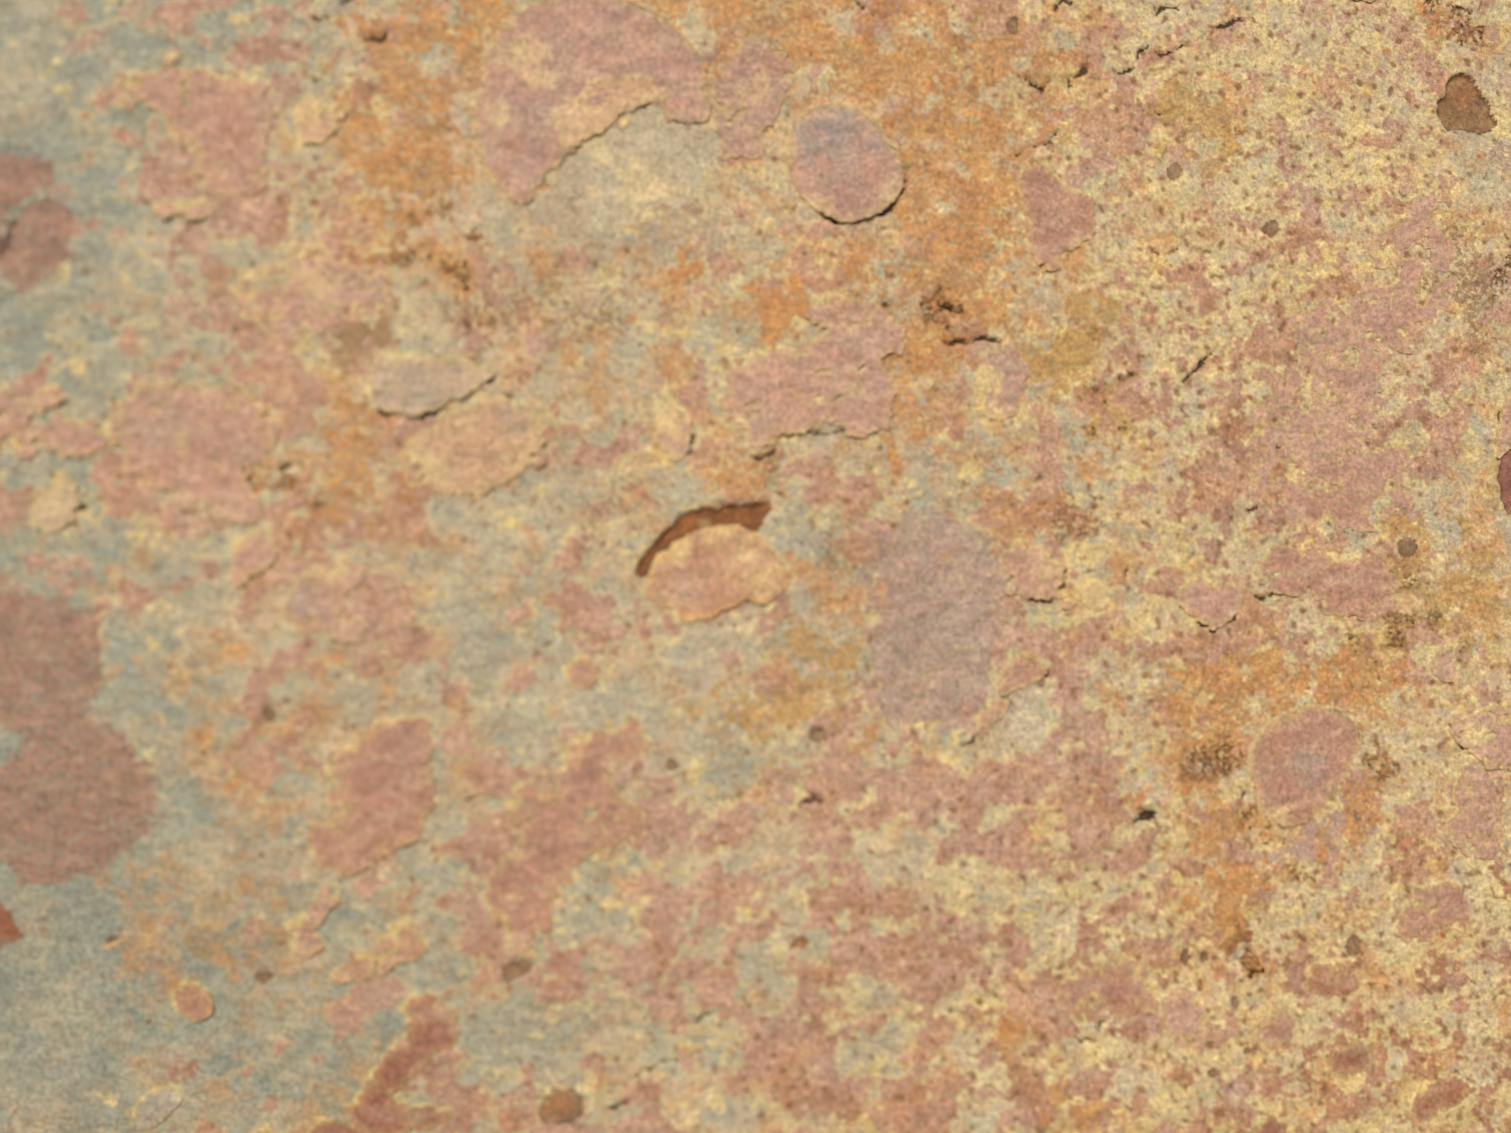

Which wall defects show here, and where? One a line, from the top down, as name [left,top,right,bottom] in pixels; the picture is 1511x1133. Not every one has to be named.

corrosion [296,0,636,399]
peeling [470,0,908,244]
corrosion [640,0,1154,583]
spalling [1437,73,1497,135]
peeling [1494,394,1511,515]
peeling [1246,703,1363,830]